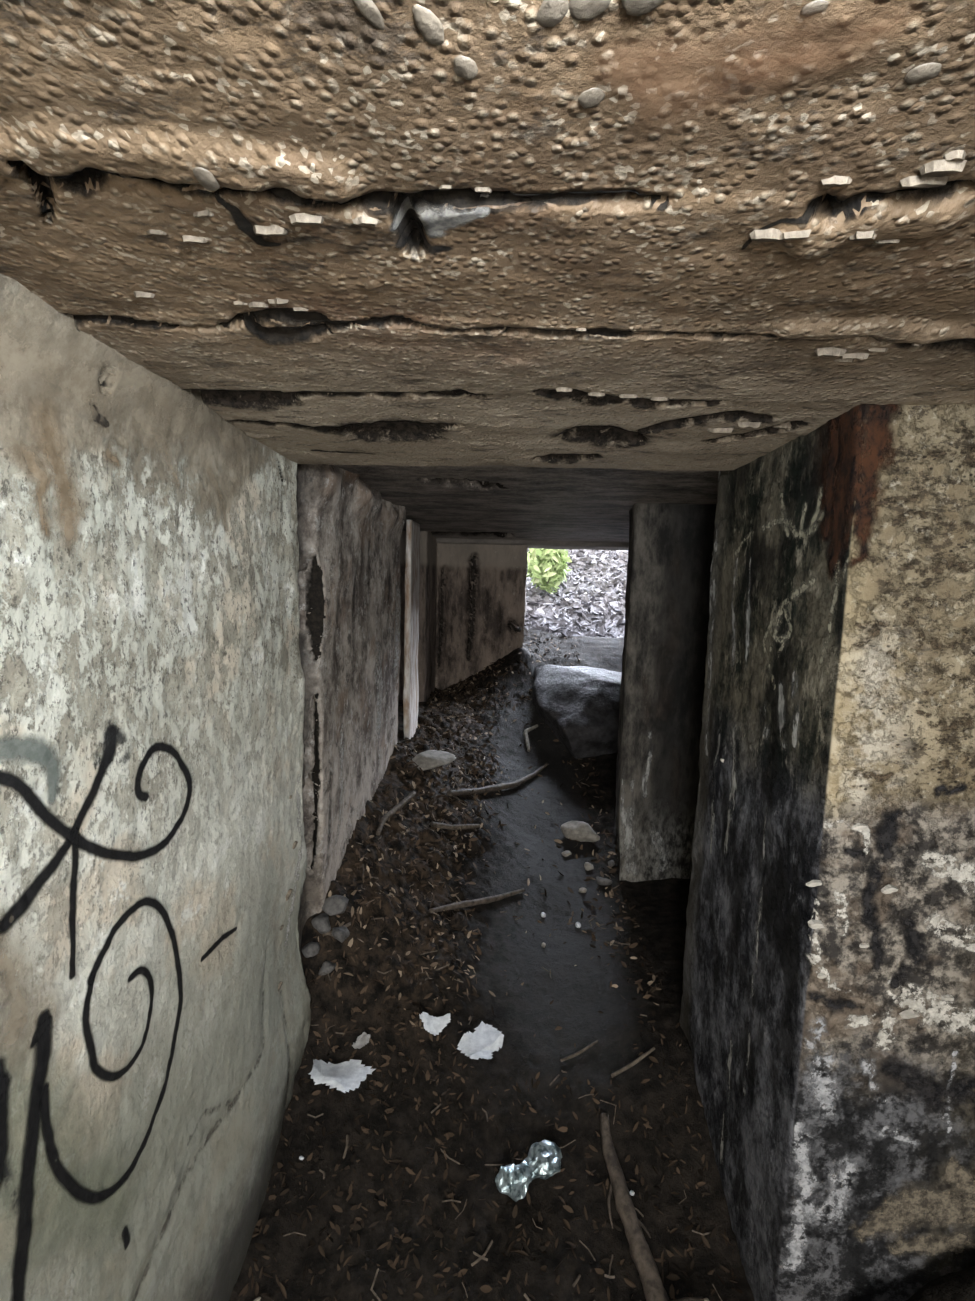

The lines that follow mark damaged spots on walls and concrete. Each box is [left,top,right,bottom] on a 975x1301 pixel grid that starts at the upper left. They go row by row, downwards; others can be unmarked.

crack [7,160,669,252]
spalling [184,389,489,454]
spalling [532,387,808,464]
rust [818,404,899,579]
damp [705,521,751,855]
damp [763,670,799,749]
damp [720,1032,750,1161]